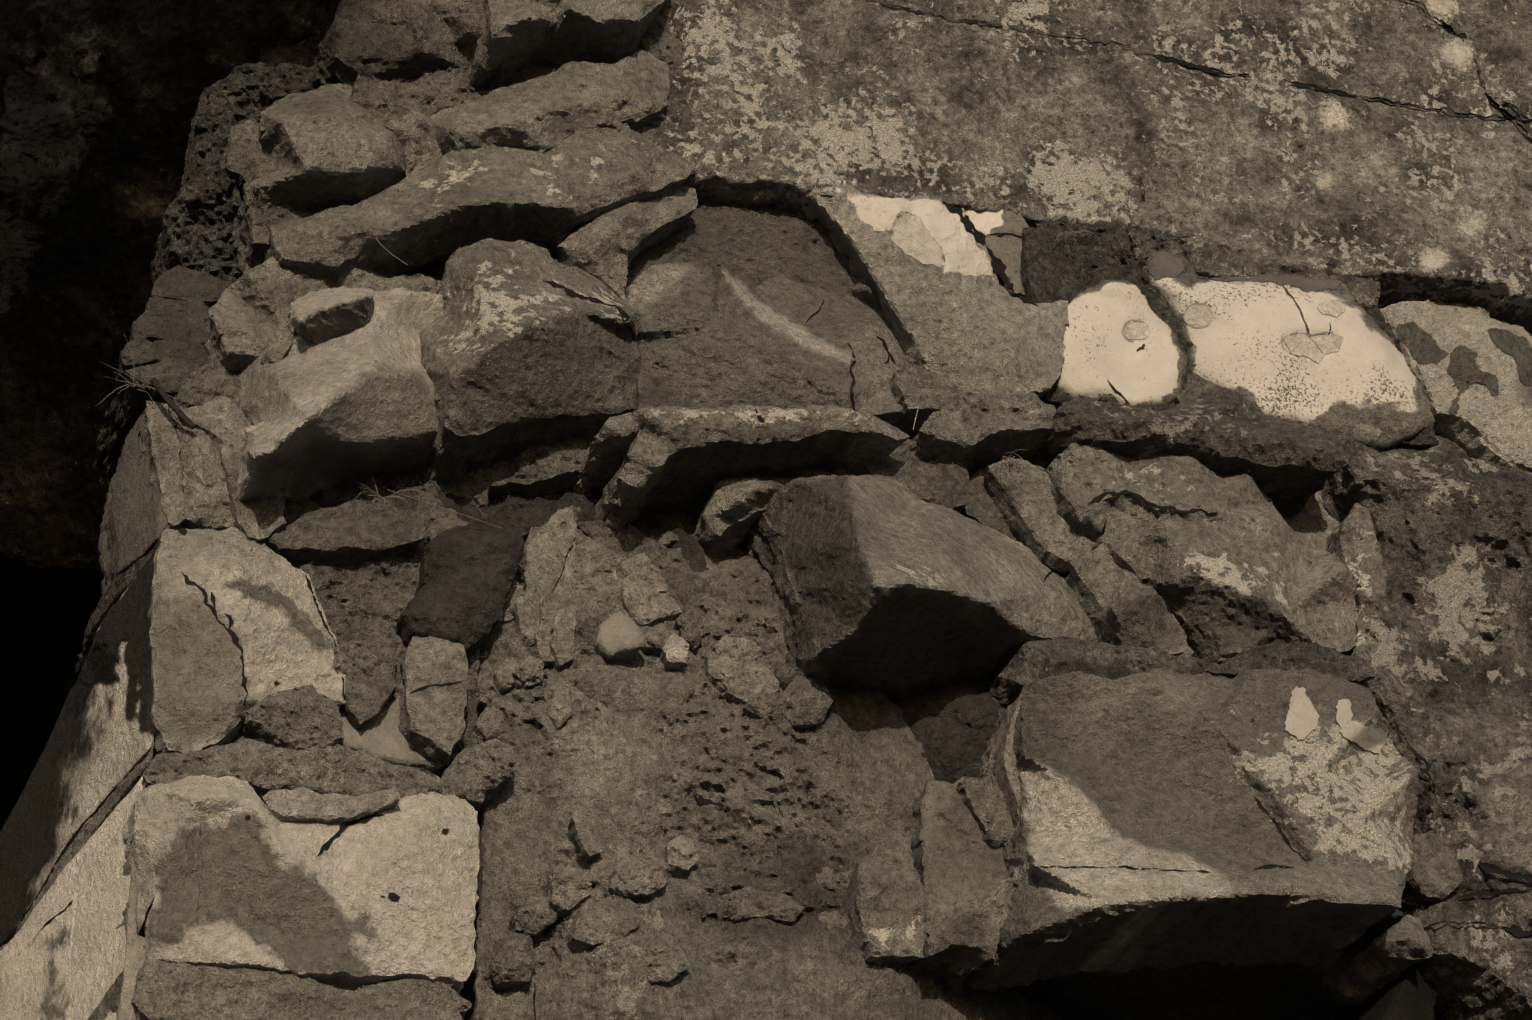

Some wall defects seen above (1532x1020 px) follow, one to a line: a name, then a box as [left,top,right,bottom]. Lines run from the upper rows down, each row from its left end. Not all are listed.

crack [866,0,1250,76]
crack [1288,0,1532,141]
peeling [891,213,945,267]
crack [943,201,1038,306]
spalling [286,286,374,356]
peeling [1122,319,1150,342]
peeling [1198,274,1346,364]
peeling [1352,422,1383,444]
peeling [498,509,577,670]
crack [182,572,248,706]
spalling [966,666,1419,993]